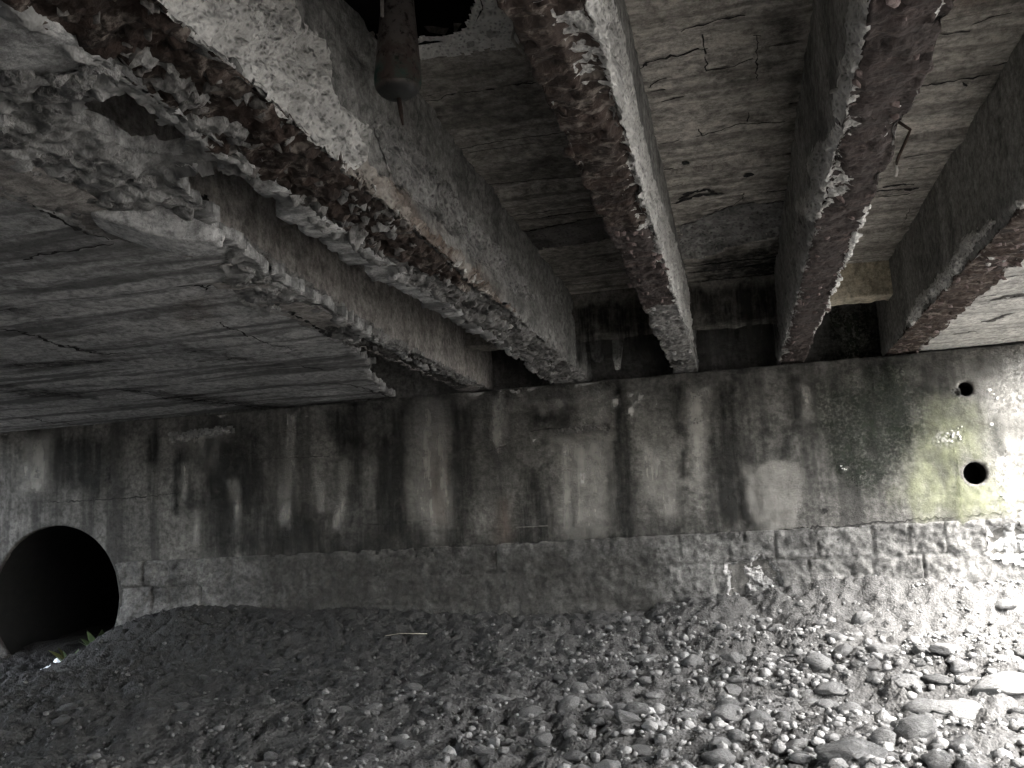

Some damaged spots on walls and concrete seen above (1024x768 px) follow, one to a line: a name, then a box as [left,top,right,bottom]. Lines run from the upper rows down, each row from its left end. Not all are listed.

crack [640,15,760,102]
crack [21,201,113,260]
spalling [0,0,587,389]
spalling [418,0,699,374]
crack [661,112,785,211]
spalling [775,0,954,365]
crack [876,154,923,223]
spalling [884,199,1024,356]
water stain [24,438,110,498]
water stain [159,389,660,616]
water stain [674,386,763,533]
water stain [781,377,808,457]